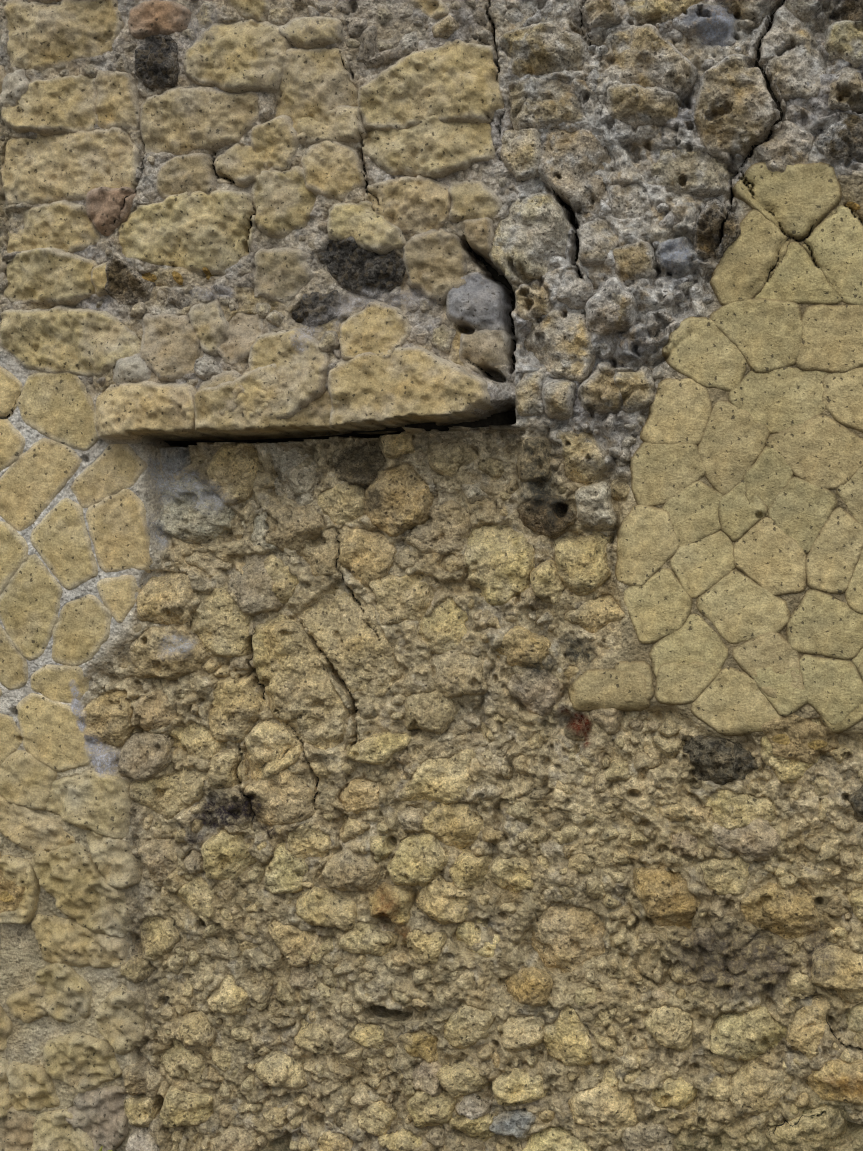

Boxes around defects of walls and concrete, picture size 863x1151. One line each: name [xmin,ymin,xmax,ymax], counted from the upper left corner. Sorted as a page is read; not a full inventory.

crack [469,1,505,160]
crack [714,0,863,283]
crack [463,232,517,381]
crack [551,187,582,279]
crack [164,410,516,447]
crack [237,626,319,837]